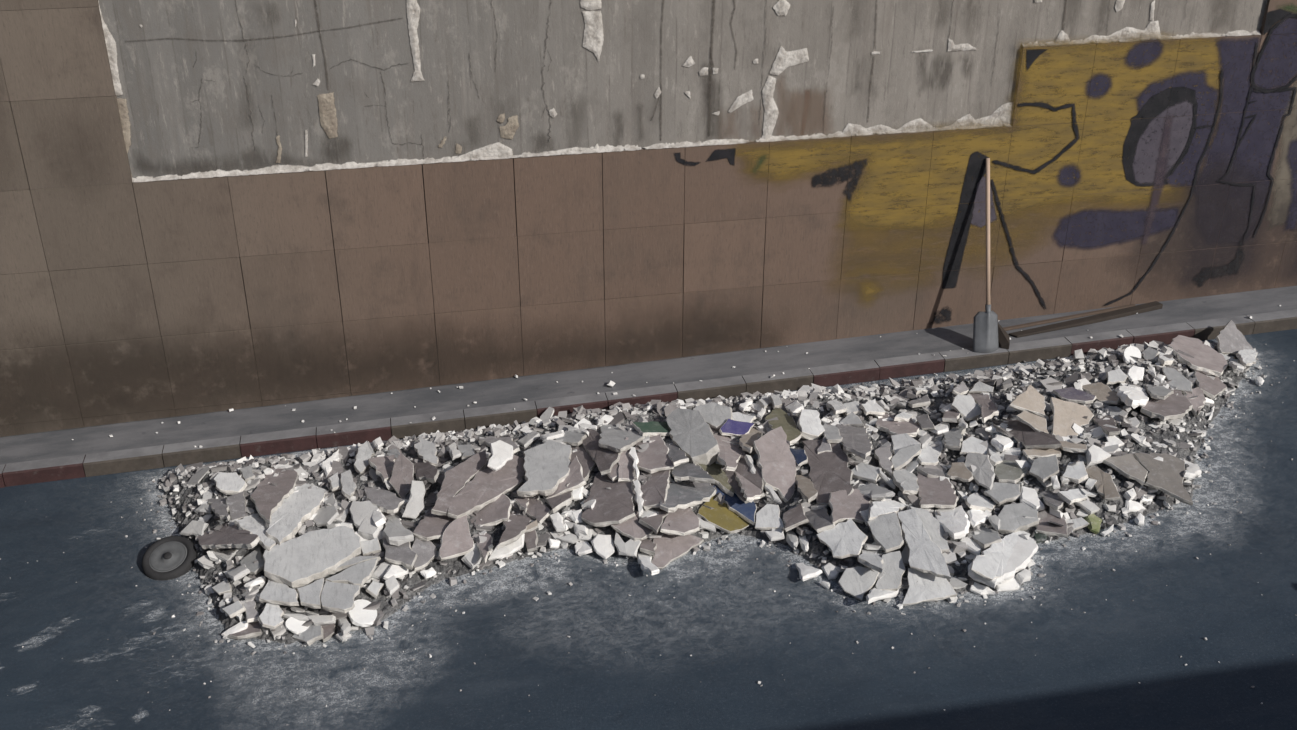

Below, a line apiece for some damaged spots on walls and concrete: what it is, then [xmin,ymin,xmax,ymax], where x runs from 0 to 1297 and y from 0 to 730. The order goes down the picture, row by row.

crack [238,2,424,157]
peeling [98,0,1267,183]
water stain [0,343,503,423]